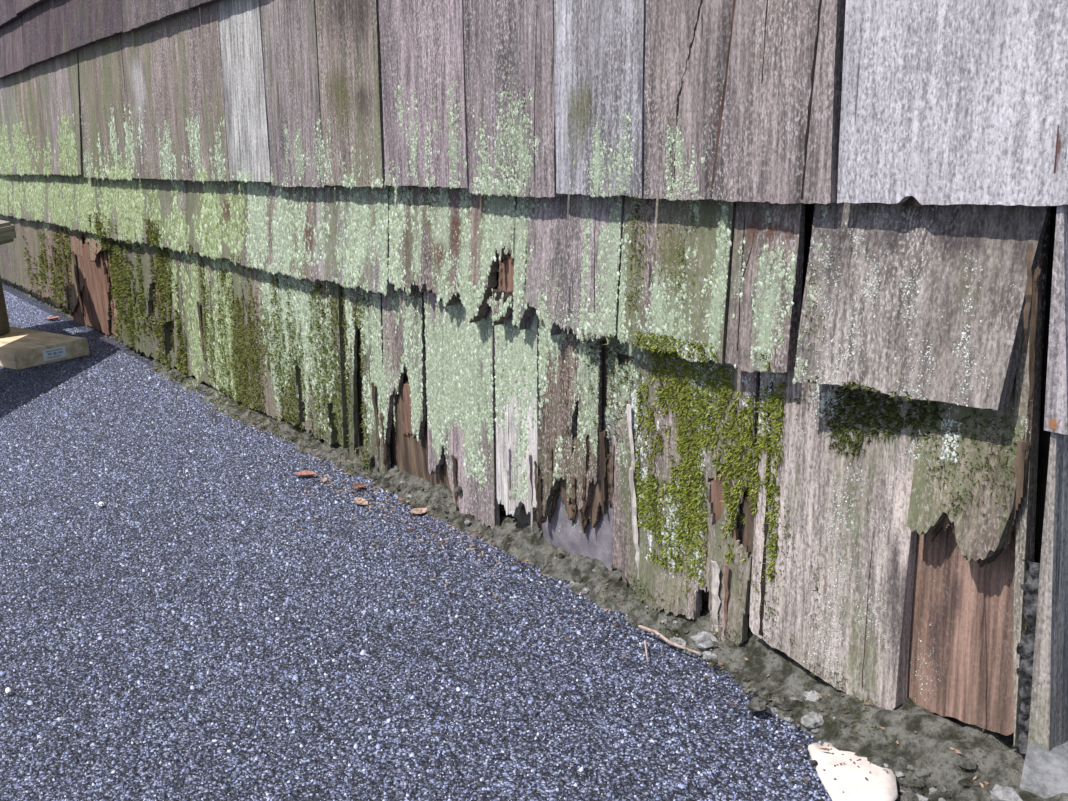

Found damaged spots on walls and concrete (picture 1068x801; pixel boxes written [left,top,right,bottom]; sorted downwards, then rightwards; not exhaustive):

crack [671,0,702,193]
crack [710,0,736,196]
crack [760,5,768,84]
crack [801,0,821,199]
water stain [434,221,461,272]
spalling [397,481,471,529]